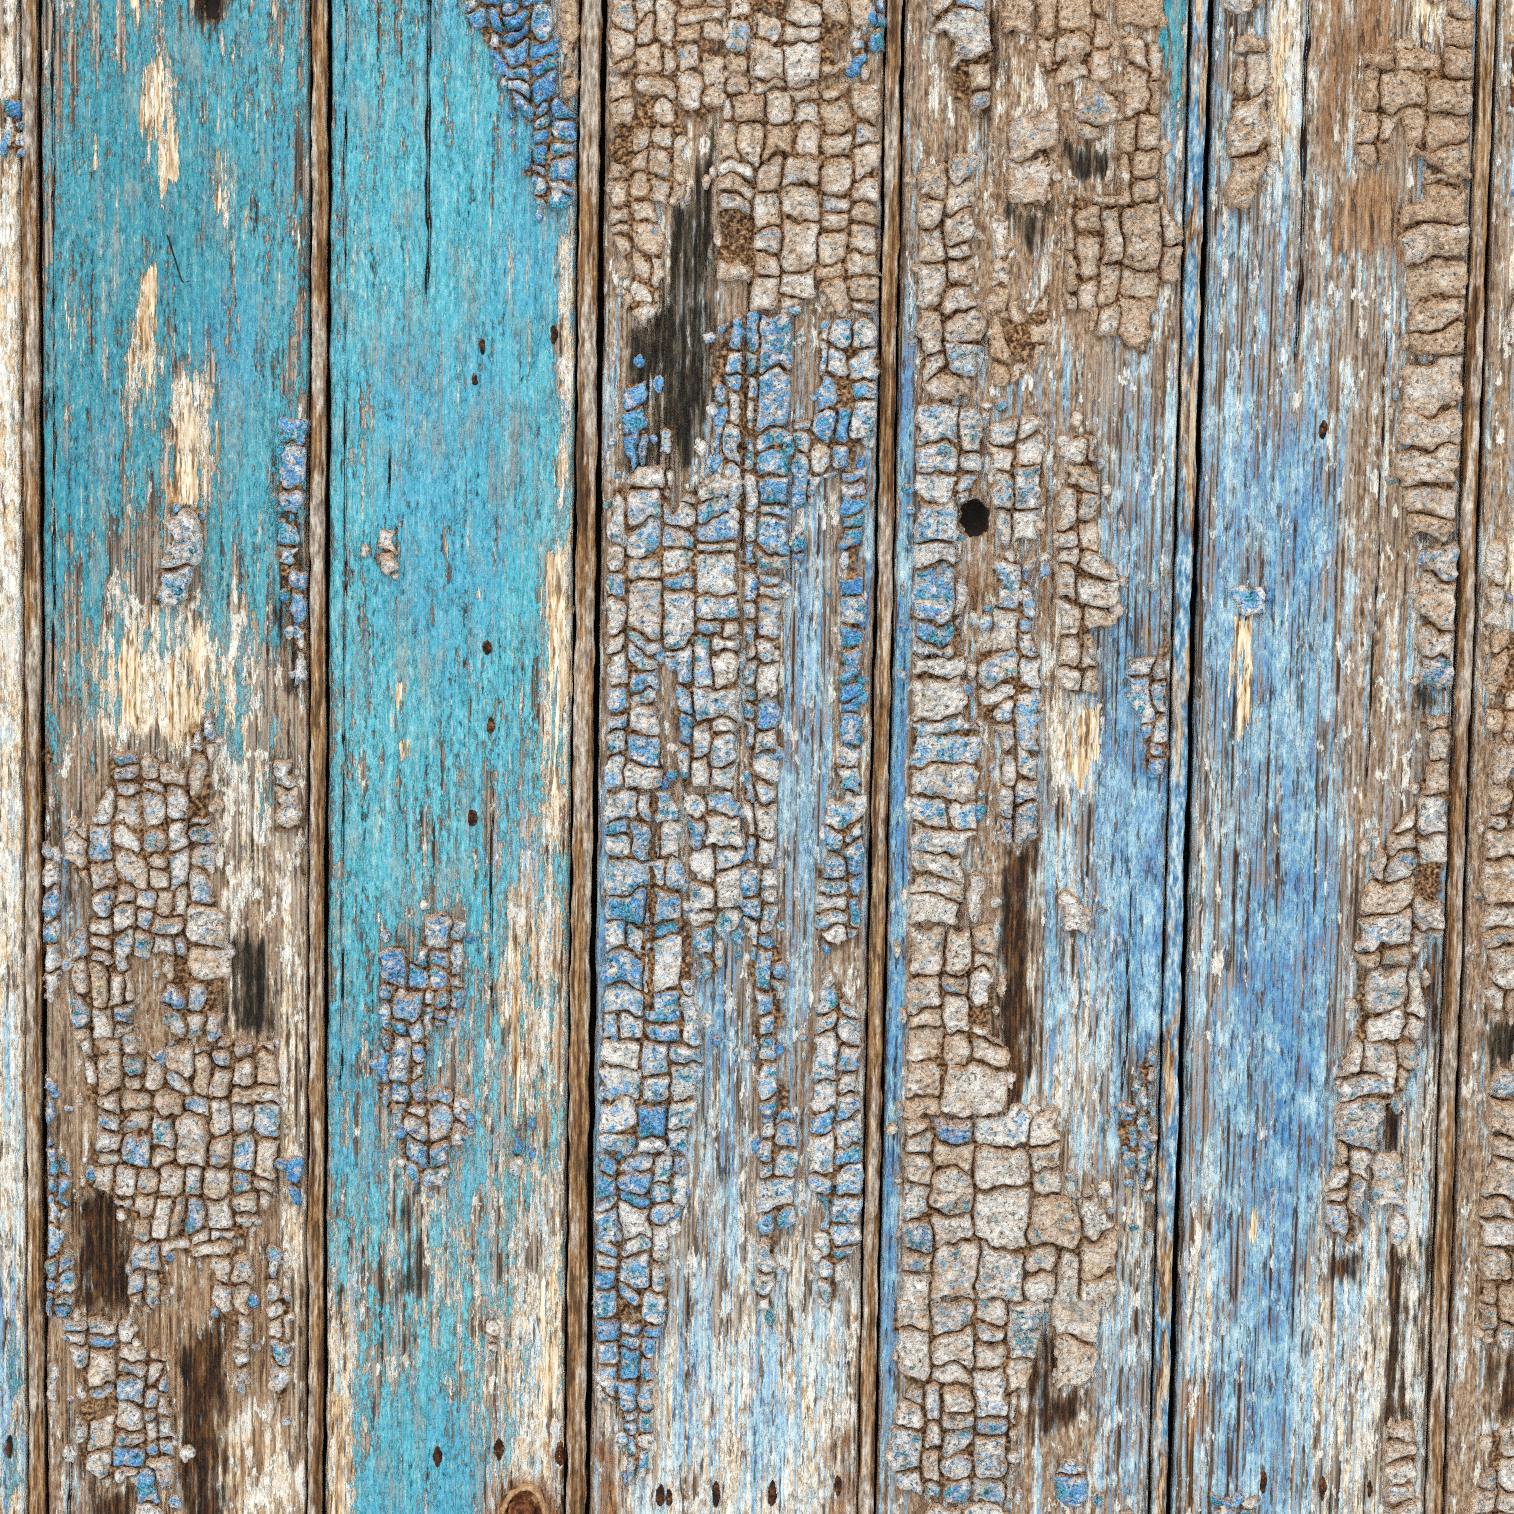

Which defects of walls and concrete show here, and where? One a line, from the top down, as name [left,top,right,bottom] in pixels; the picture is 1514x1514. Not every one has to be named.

peeling [42,618,307,1514]
peeling [151,502,207,607]
peeling [362,897,475,1198]
peeling [462,0,580,223]
peeling [591,0,887,1486]
peeling [883,0,1184,1514]
peeling [1224,34,1279,210]
peeling [1323,714,1452,1246]
peeling [1354,0,1475,691]
peeling [1469,489,1514,1026]
peeling [1472,1054,1514,1353]
rust [487,1482,556,1514]